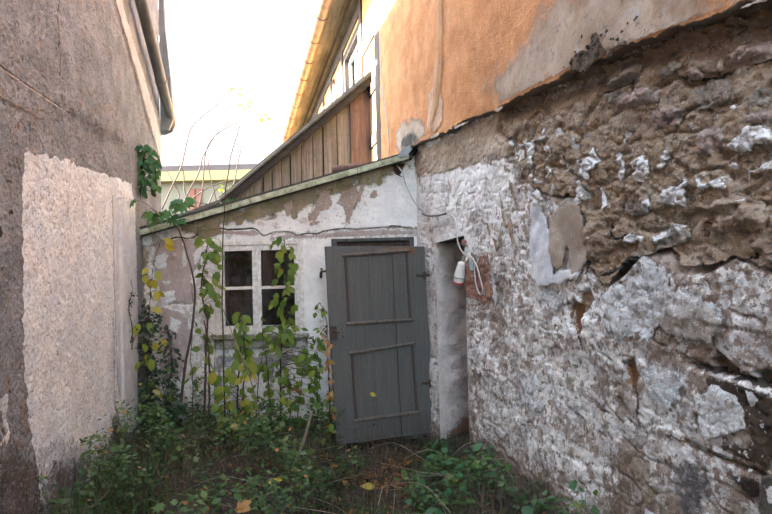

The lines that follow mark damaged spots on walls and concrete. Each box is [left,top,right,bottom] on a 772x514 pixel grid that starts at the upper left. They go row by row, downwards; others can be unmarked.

crack [0,0,71,140]
leakage [494,0,699,102]
spalling [414,0,772,303]
peeling [308,185,378,226]
peeling [582,291,594,313]